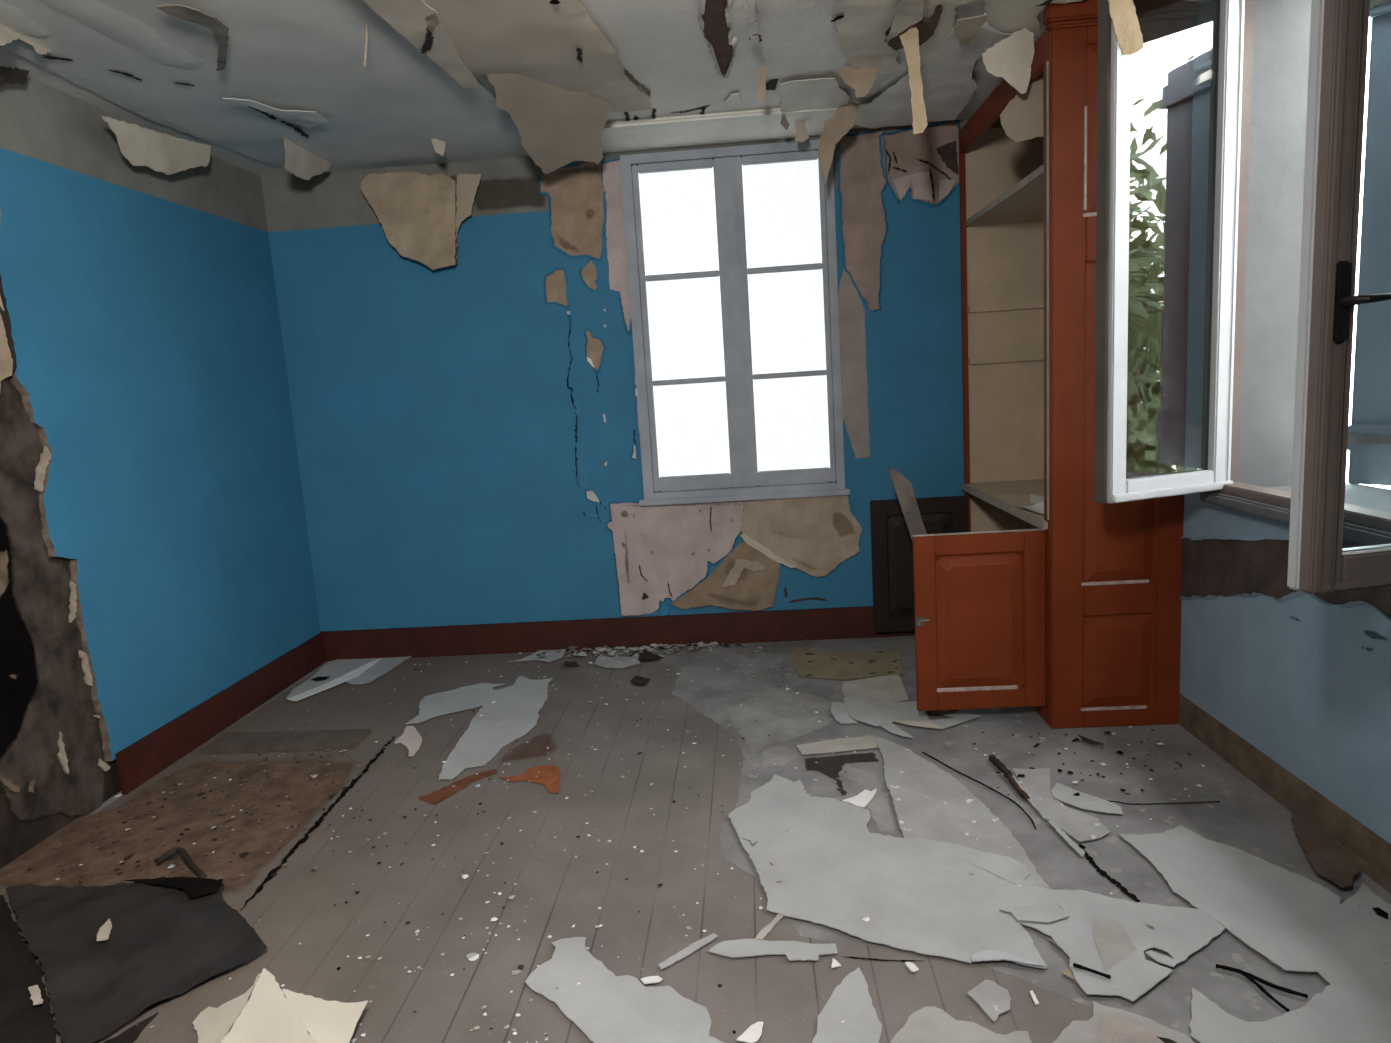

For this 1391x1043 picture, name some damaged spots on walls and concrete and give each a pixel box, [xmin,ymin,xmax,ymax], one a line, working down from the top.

peeling [539,158,632,374]
peeling [836,120,961,458]
flaking render [0,378,111,822]
flaking render [585,488,744,617]
flaking render [1179,535,1391,653]